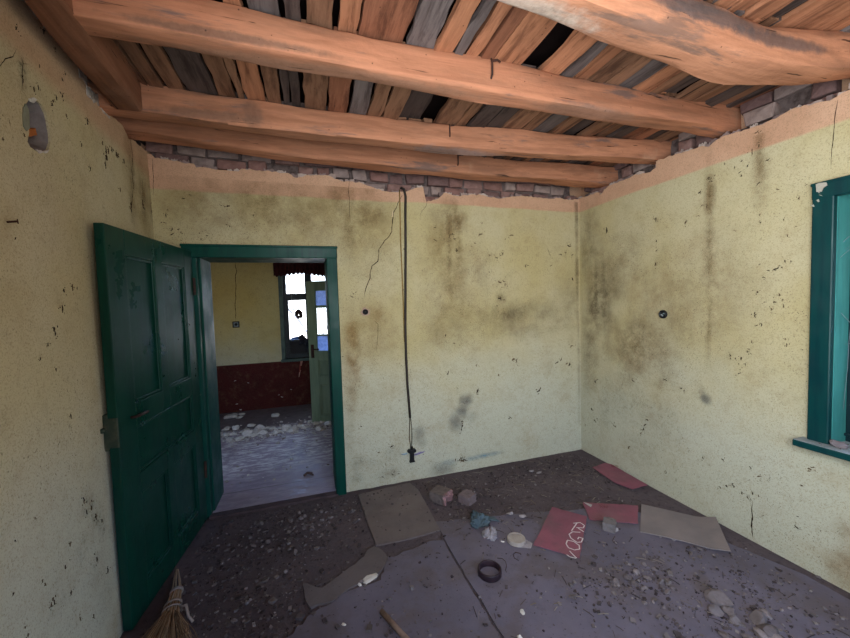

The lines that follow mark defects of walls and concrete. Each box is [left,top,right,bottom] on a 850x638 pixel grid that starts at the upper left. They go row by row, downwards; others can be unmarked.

spalling [21,76,49,154]
spalling [145,141,656,202]
spalling [671,79,850,177]
crack [364,196,402,295]